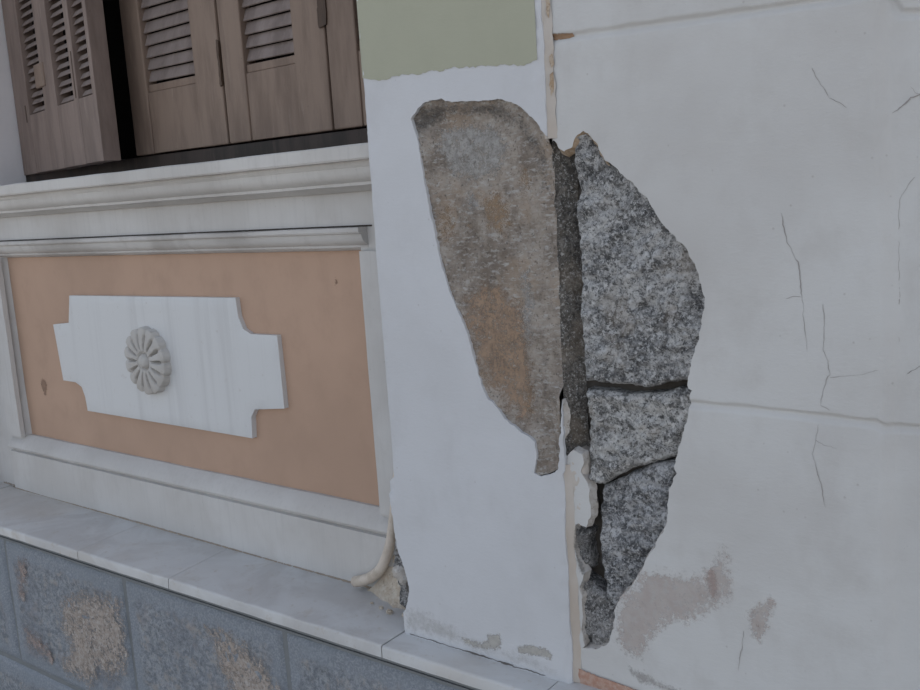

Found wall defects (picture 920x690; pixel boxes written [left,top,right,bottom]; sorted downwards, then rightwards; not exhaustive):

flaking render [414,99,705,650]
crack [781,213,877,411]